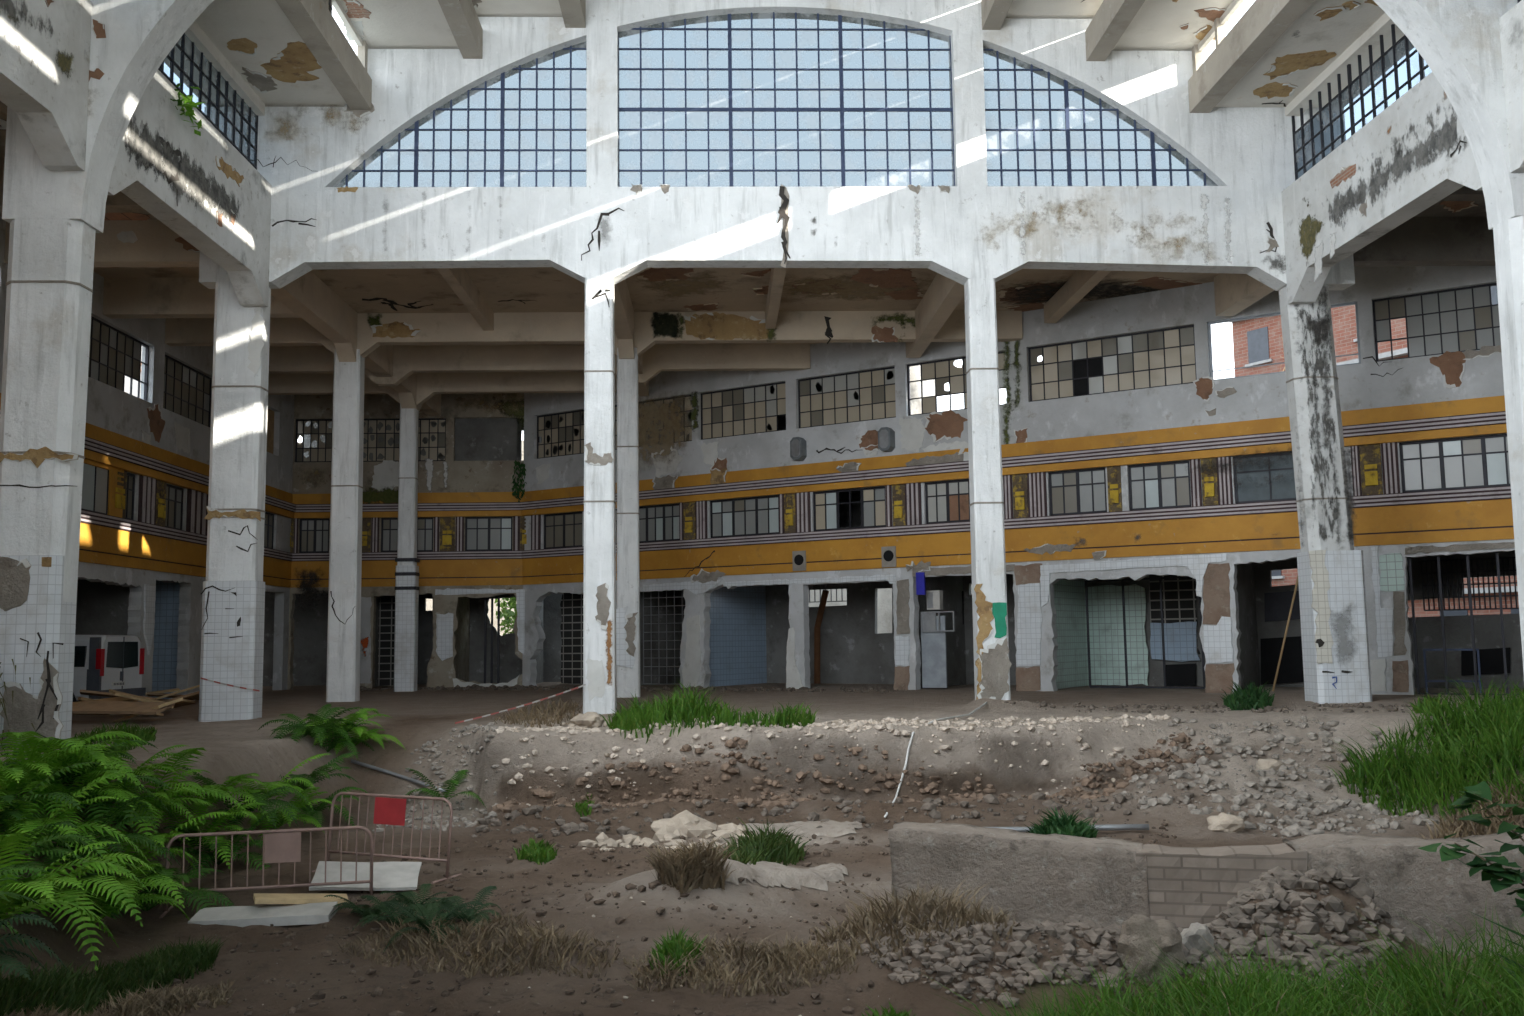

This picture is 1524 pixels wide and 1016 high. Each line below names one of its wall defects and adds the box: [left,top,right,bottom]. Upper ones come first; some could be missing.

peeling [227,38,322,93]
peeling [1253,50,1337,99]
crack [581,208,624,306]
crack [777,184,790,268]
water stain [1295,108,1467,546]
spalling [1430,345,1502,389]
spalling [899,410,969,466]
spalling [0,556,52,611]
spalling [974,584,1011,700]
crack [20,632,64,738]